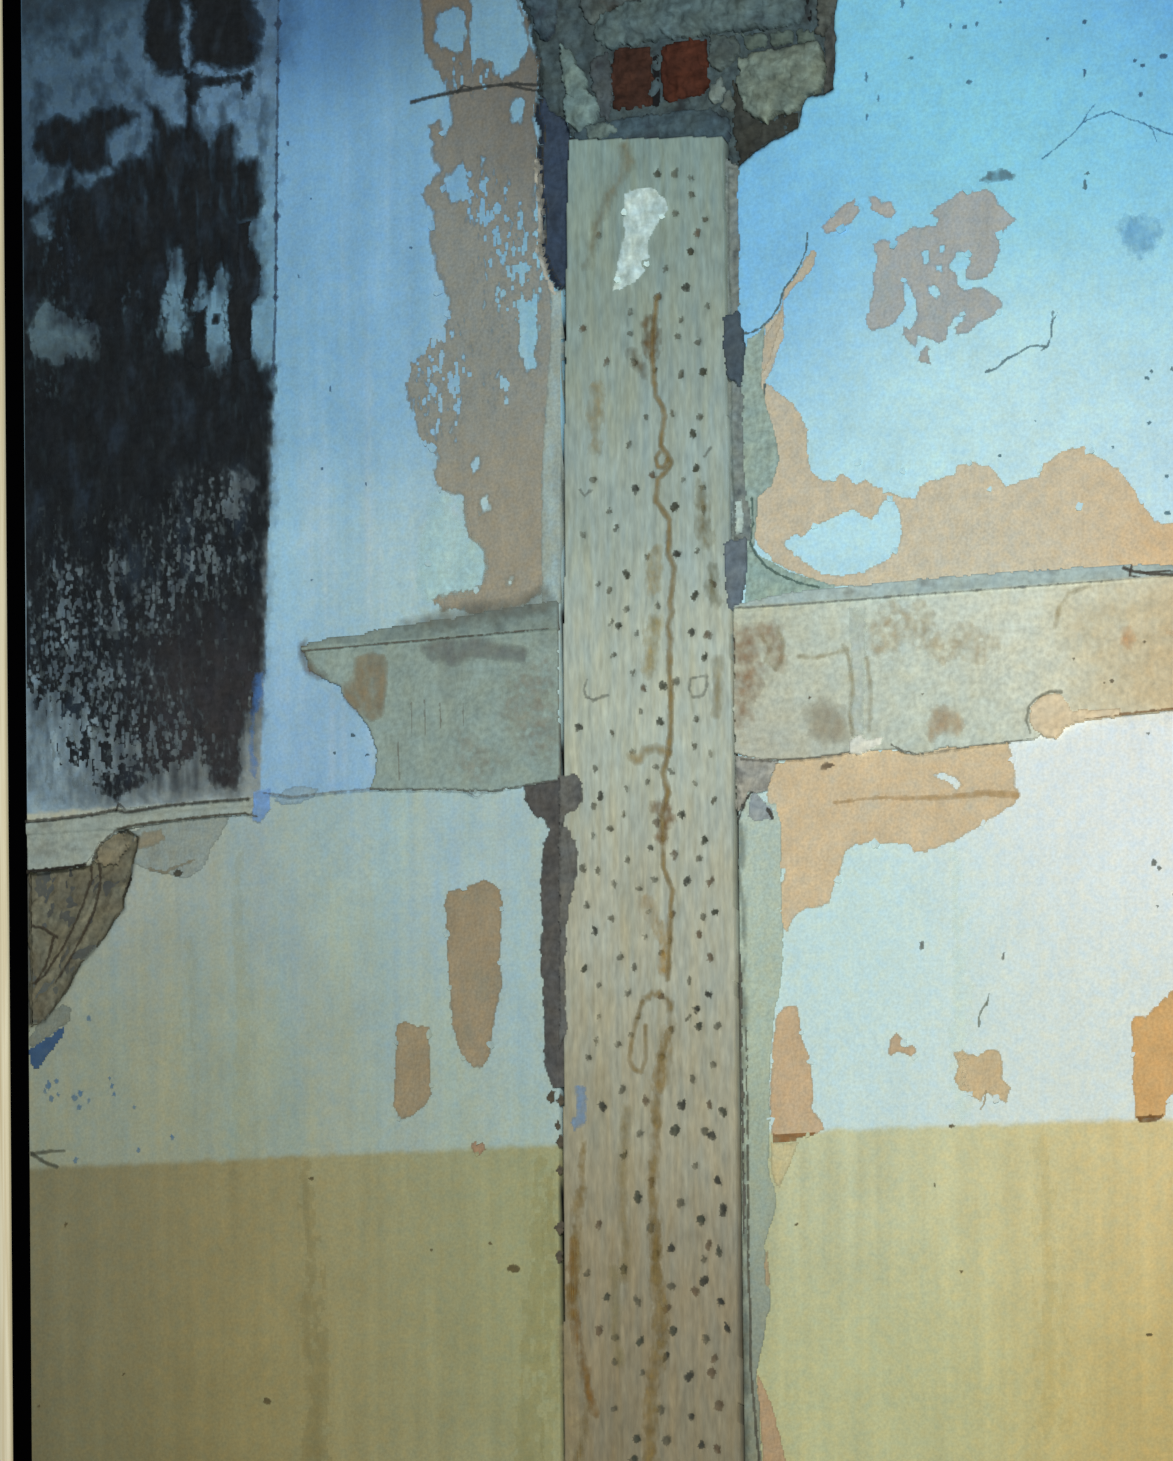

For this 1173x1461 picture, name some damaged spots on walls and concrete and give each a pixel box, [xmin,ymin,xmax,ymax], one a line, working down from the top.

water stain [22,0,105,22]
crack [1042,111,1171,159]
peeling [405,0,837,614]
peeling [866,185,1015,364]
peeling [735,250,1173,586]
crack [985,311,1055,373]
corrosion [644,296,675,1010]
peeling [735,742,1019,932]
flaking render [27,829,139,1069]
peeling [443,880,504,1067]
peeling [1130,991,1173,1122]
corrosion [650,1157,666,1356]